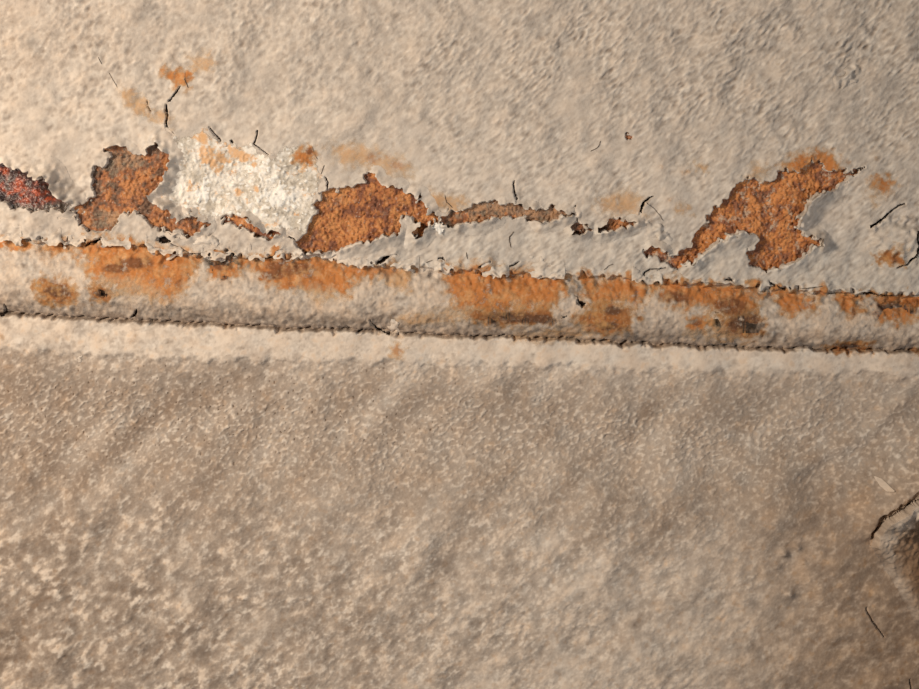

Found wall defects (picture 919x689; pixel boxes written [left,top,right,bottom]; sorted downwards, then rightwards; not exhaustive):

corrosion [782,147,845,173]
peeling [0,124,858,282]
peeling [631,266,663,285]
crack [769,281,887,296]